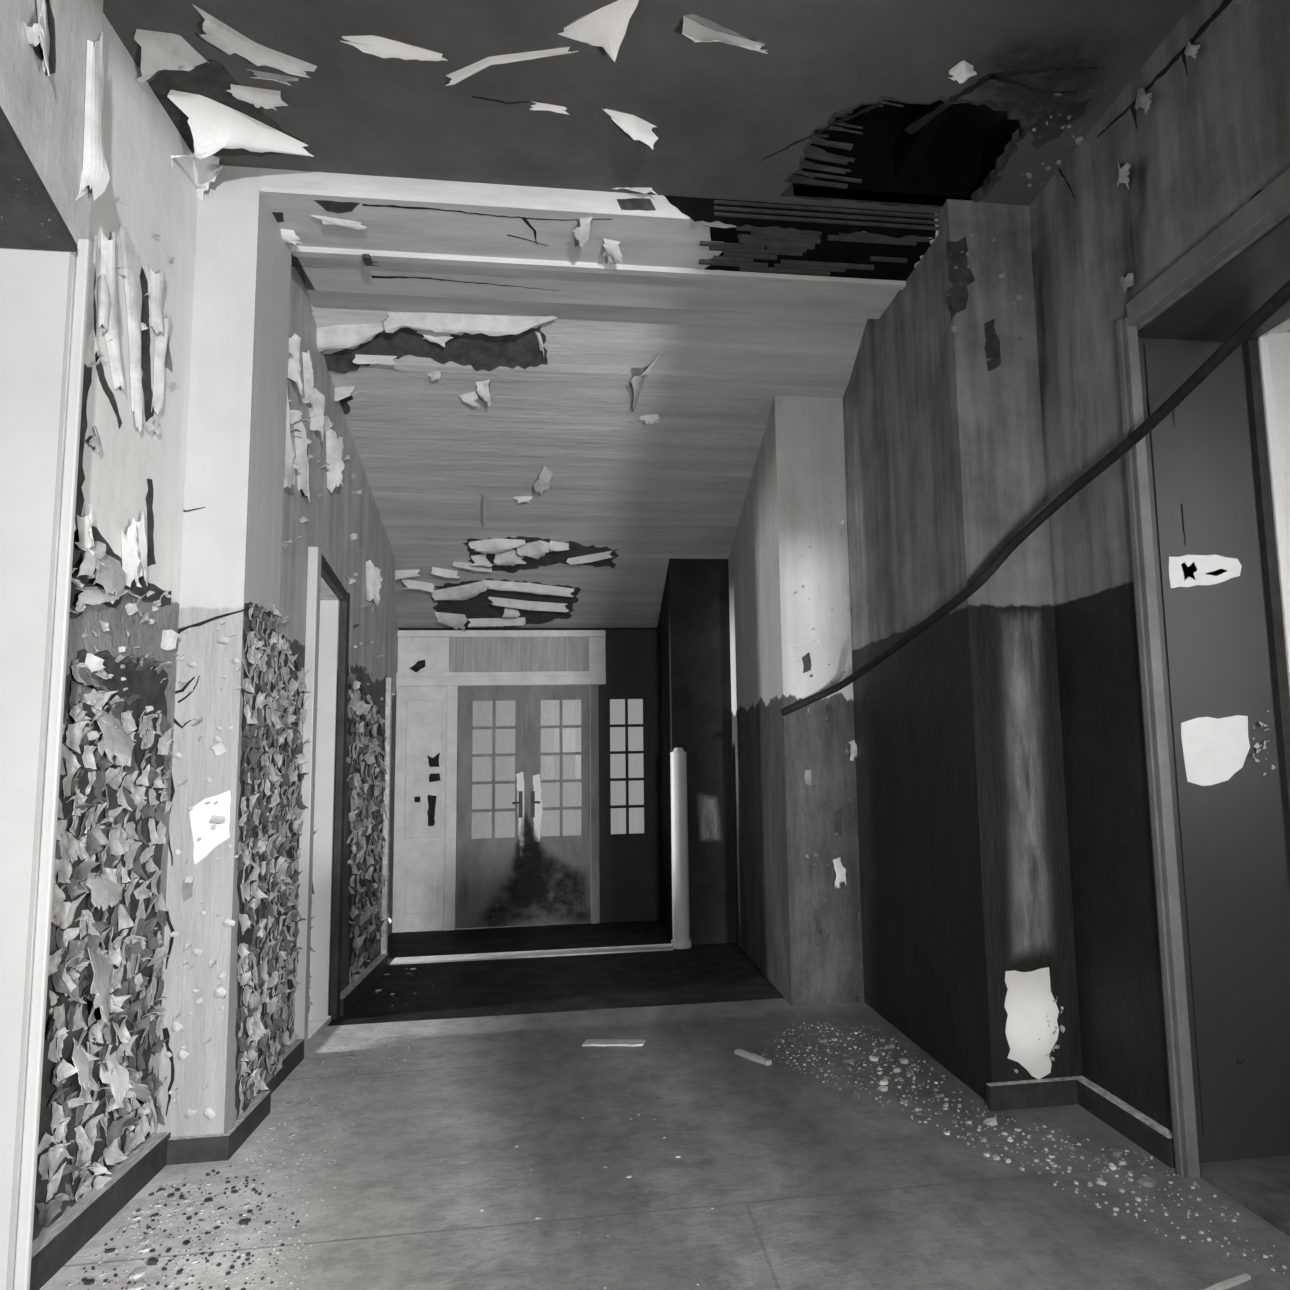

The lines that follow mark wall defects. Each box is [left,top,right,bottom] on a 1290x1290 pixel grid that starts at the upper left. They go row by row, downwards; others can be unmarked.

peeling [32,225,319,1241]